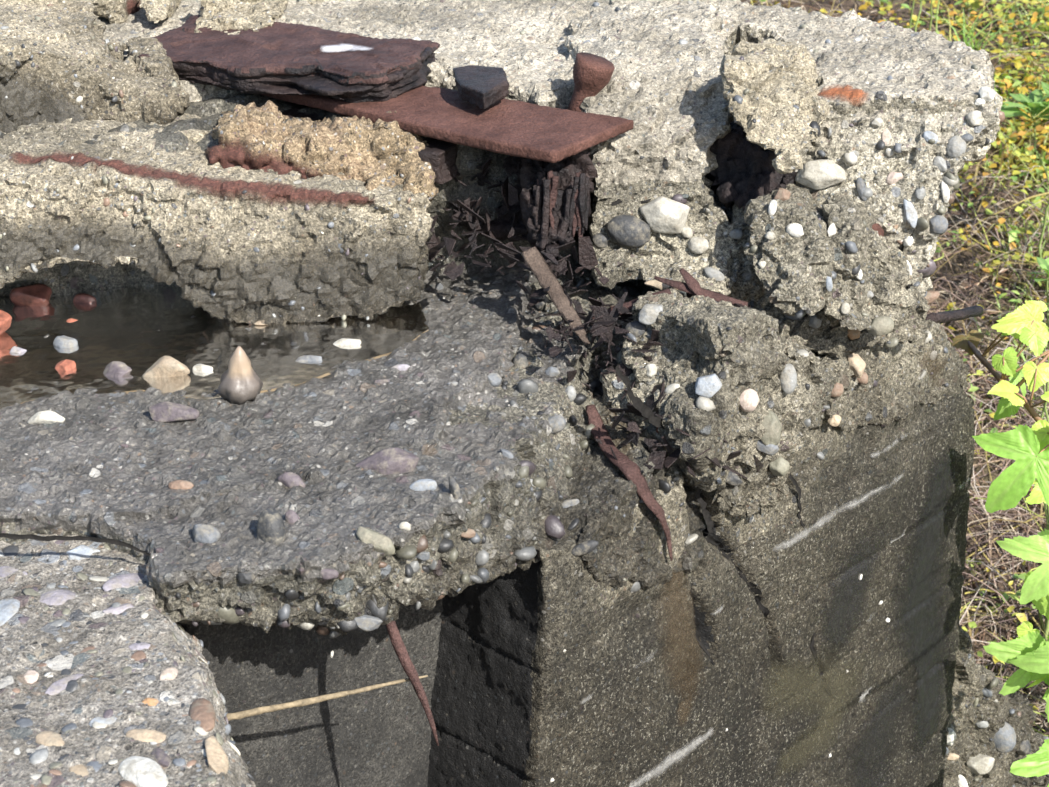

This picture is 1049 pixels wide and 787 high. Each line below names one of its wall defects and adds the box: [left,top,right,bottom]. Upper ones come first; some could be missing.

peeling [322,44,370,52]
corrosion [12,143,372,204]
spalling [795,80,1005,304]
crack [615,364,665,429]
spalling [866,330,962,404]
spalling [0,296,603,658]
spalling [623,401,857,568]
crack [788,473,805,527]
crack [0,533,150,556]
crack [695,487,769,617]
spalling [597,579,664,608]
crack [690,583,715,665]